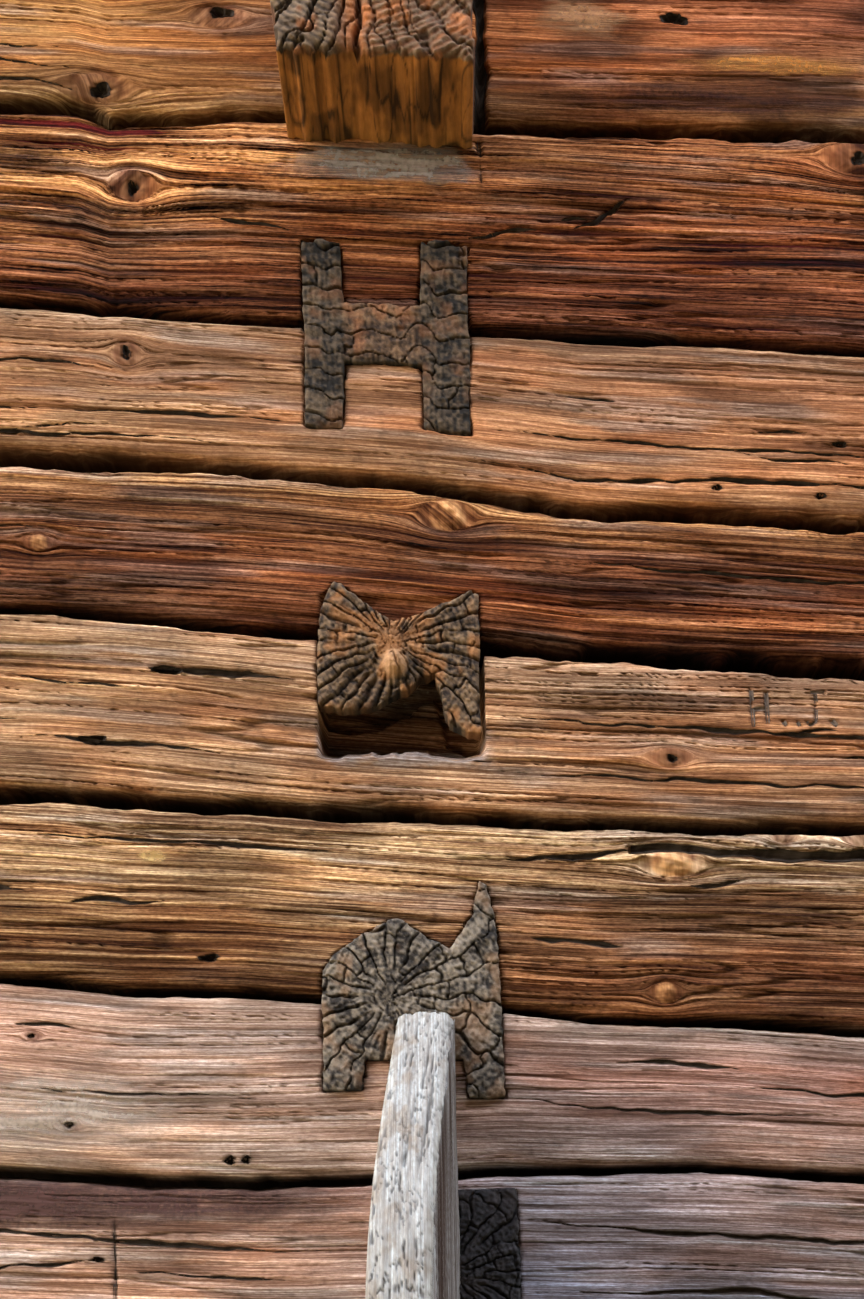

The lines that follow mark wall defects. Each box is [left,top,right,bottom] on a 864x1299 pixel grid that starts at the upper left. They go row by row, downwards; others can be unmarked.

crack [0,43,72,90]
crack [12,666,289,687]
crack [516,1059,864,1116]